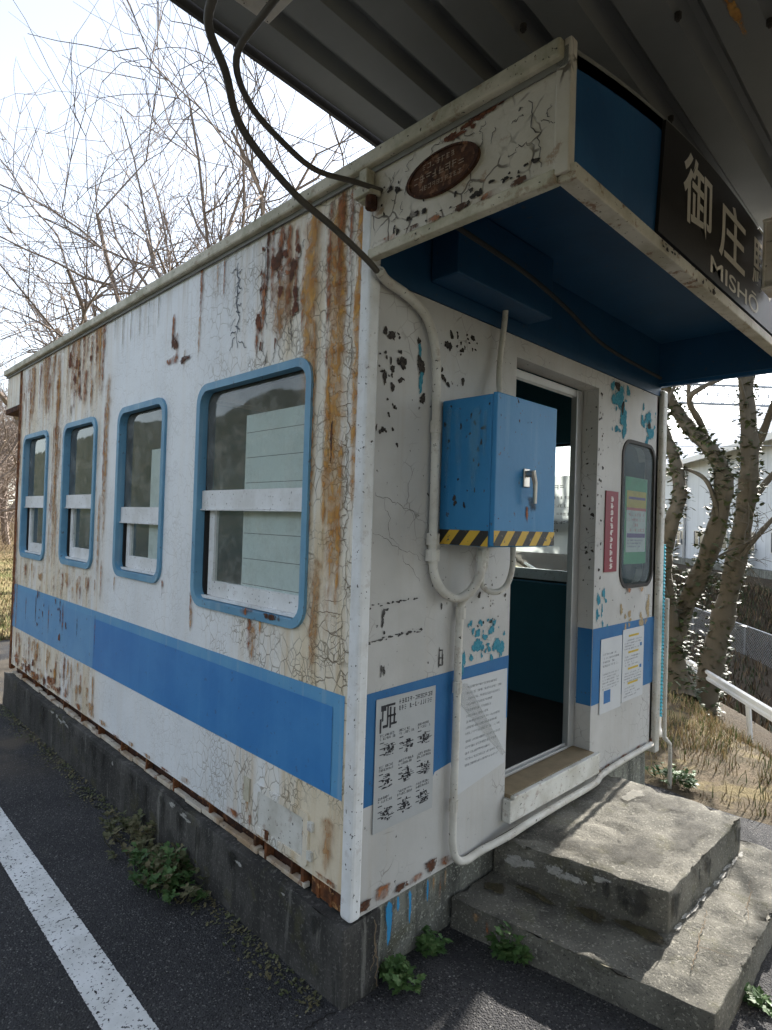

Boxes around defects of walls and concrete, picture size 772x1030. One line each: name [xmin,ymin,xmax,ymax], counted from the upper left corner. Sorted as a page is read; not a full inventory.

peeling [393,158,540,236]
crack [391,100,555,222]
crack [229,231,309,378]
corrosion [255,189,364,662]
peeling [375,326,426,448]
peeling [641,403,656,444]
corrosion [13,325,115,726]
corrosion [243,608,280,658]
peeling [462,577,506,675]
corrosion [360,856,448,913]
damp [504,854,649,917]
damp [674,828,743,930]